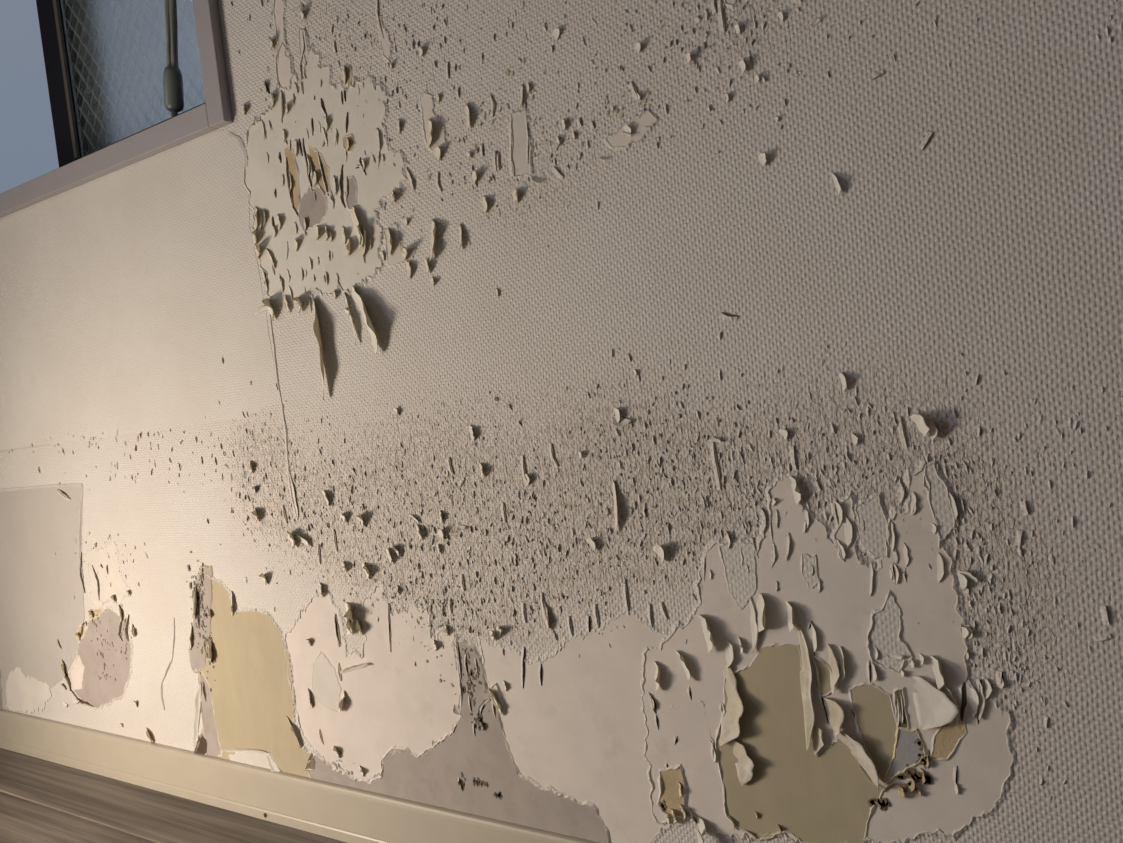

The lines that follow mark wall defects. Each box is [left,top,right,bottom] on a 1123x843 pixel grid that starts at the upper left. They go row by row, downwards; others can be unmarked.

peeling [409,62,660,204]
peeling [293,159,436,286]
peeling [789,476,801,506]
flaking render [60,590,135,708]
peeling [281,478,469,645]
peeling [698,593,766,668]
peeling [785,602,794,633]
peeling [899,653,944,689]
peeling [956,571,978,590]
flaking render [193,672,221,757]
flaking render [310,642,609,843]
spalling [657,763,698,824]